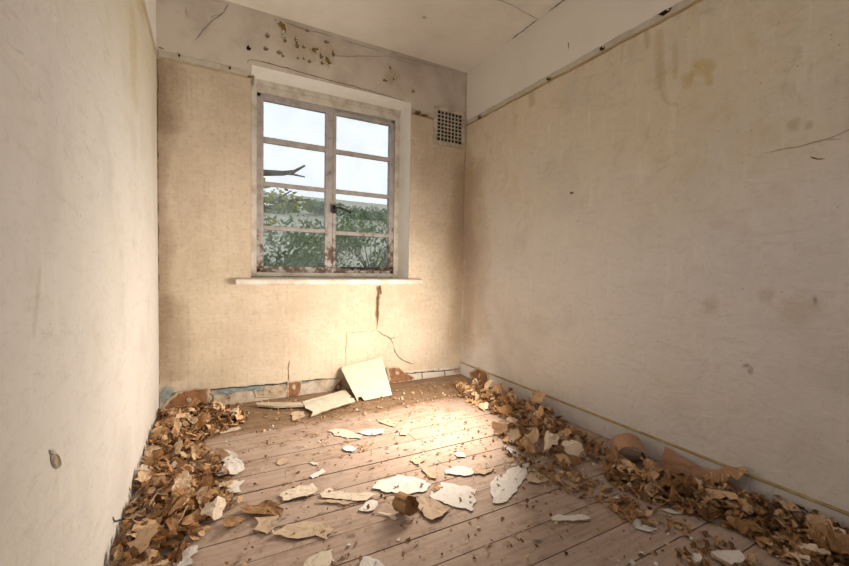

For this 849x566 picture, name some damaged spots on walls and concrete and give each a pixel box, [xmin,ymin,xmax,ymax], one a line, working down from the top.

crack [195,0,229,40]
flaking render [386,367,415,383]